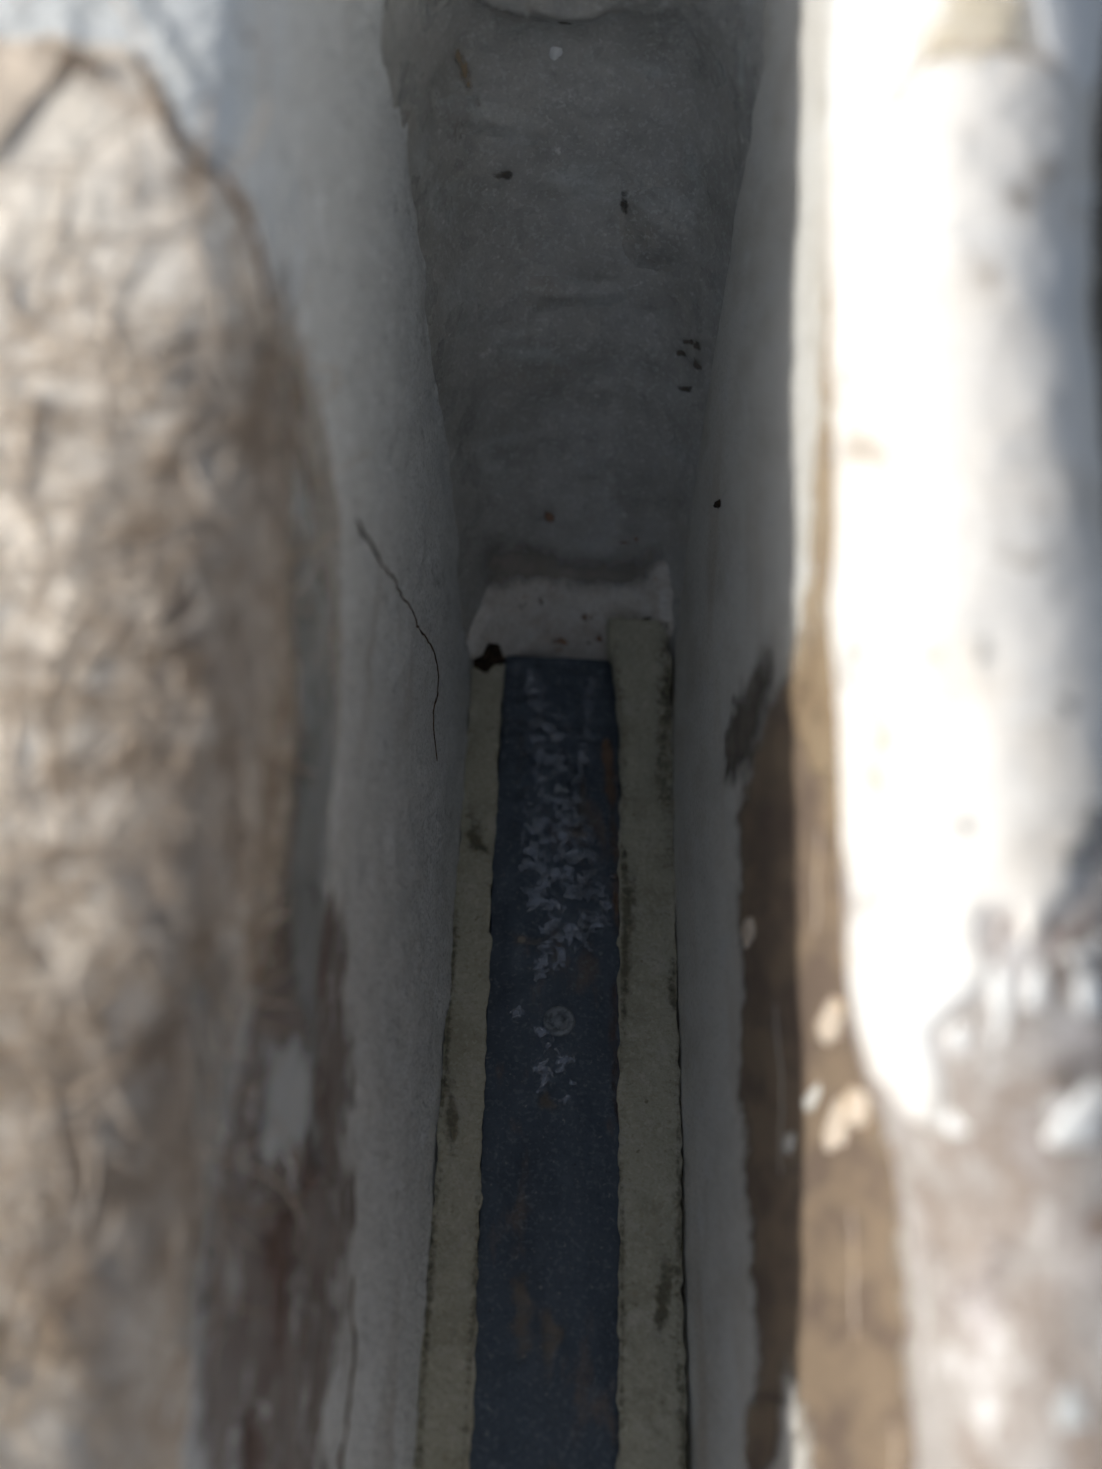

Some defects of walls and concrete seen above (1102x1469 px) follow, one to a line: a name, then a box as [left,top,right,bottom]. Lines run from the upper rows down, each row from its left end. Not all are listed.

peeling [817,0,1102,1135]
crack [356,519,439,761]
peeling [741,916,755,949]
water stain [737,677,916,1469]
peeling [802,1083,868,1152]
peeling [1045,1082,1102,1150]
water stain [196,892,356,1469]
peeling [787,1380,800,1434]
peeling [1056,1382,1088,1432]